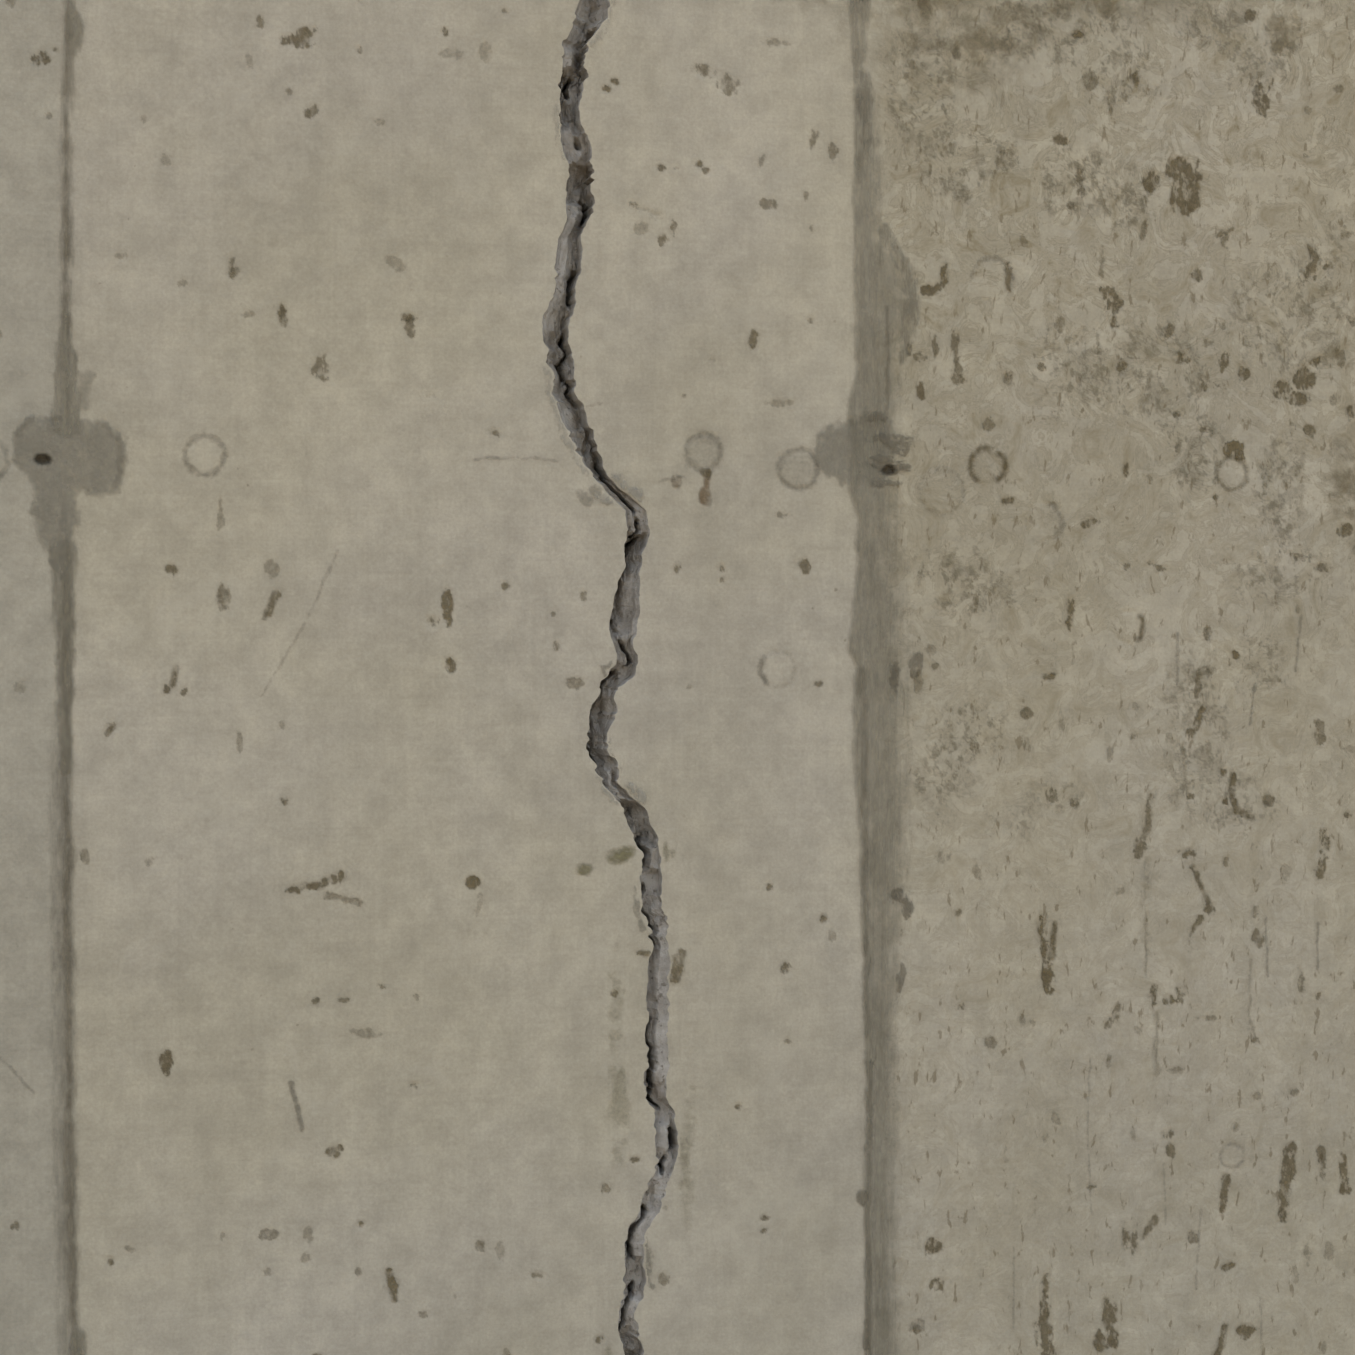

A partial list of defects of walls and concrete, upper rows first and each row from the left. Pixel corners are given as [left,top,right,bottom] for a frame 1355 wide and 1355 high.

crack [542,0,686,1355]